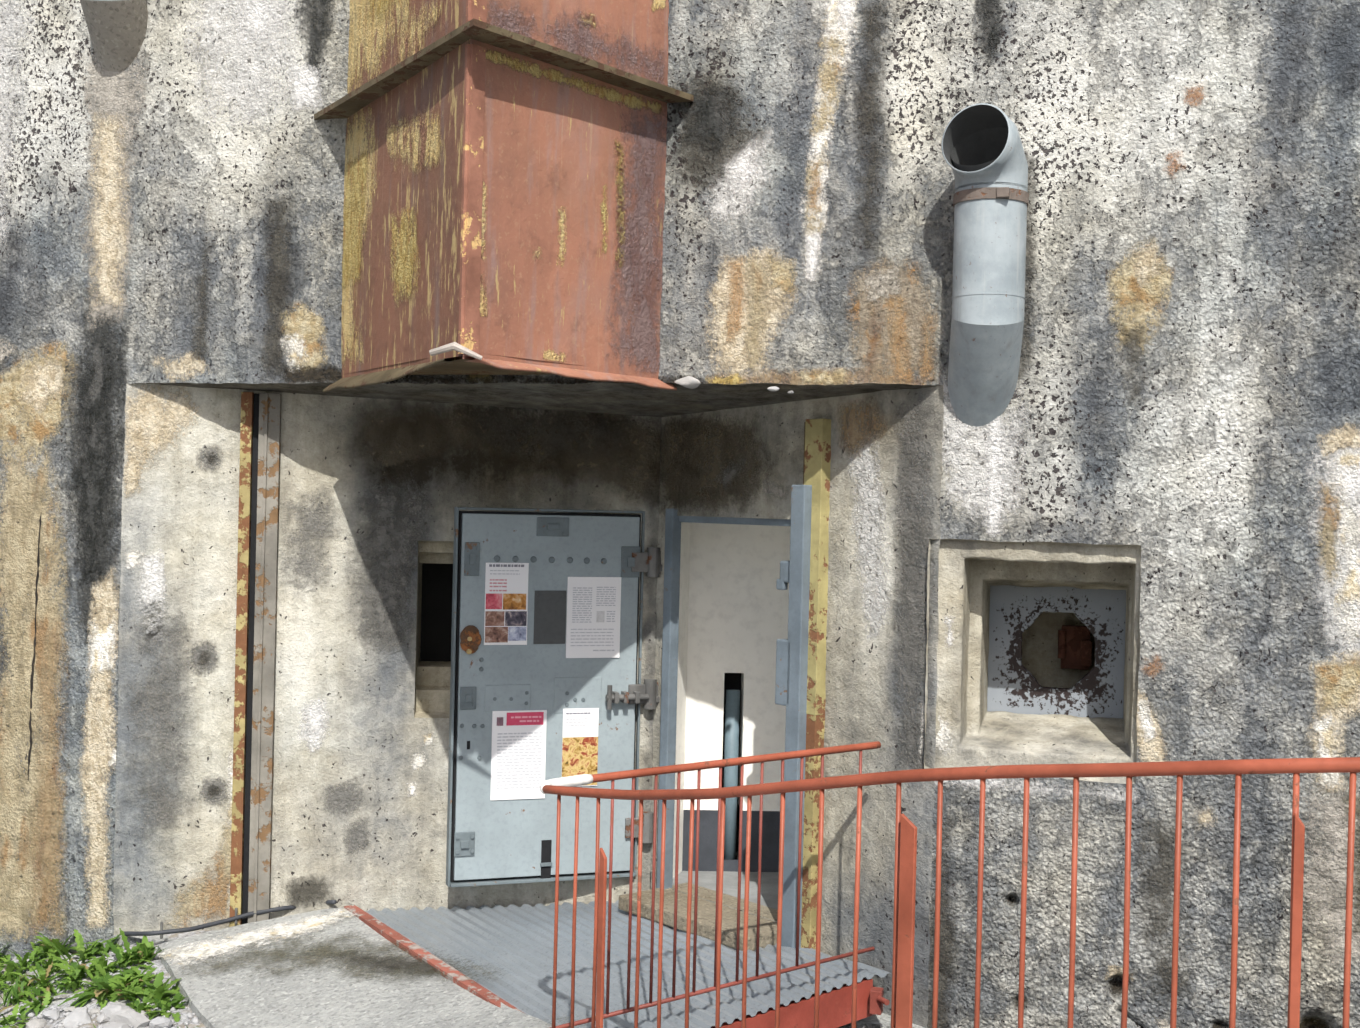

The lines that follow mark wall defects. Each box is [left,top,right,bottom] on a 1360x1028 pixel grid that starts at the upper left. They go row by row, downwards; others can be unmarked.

rust [611,114,667,373]
crack [28,516,41,780]
water stain [288,497,332,587]
water stain [354,484,427,651]